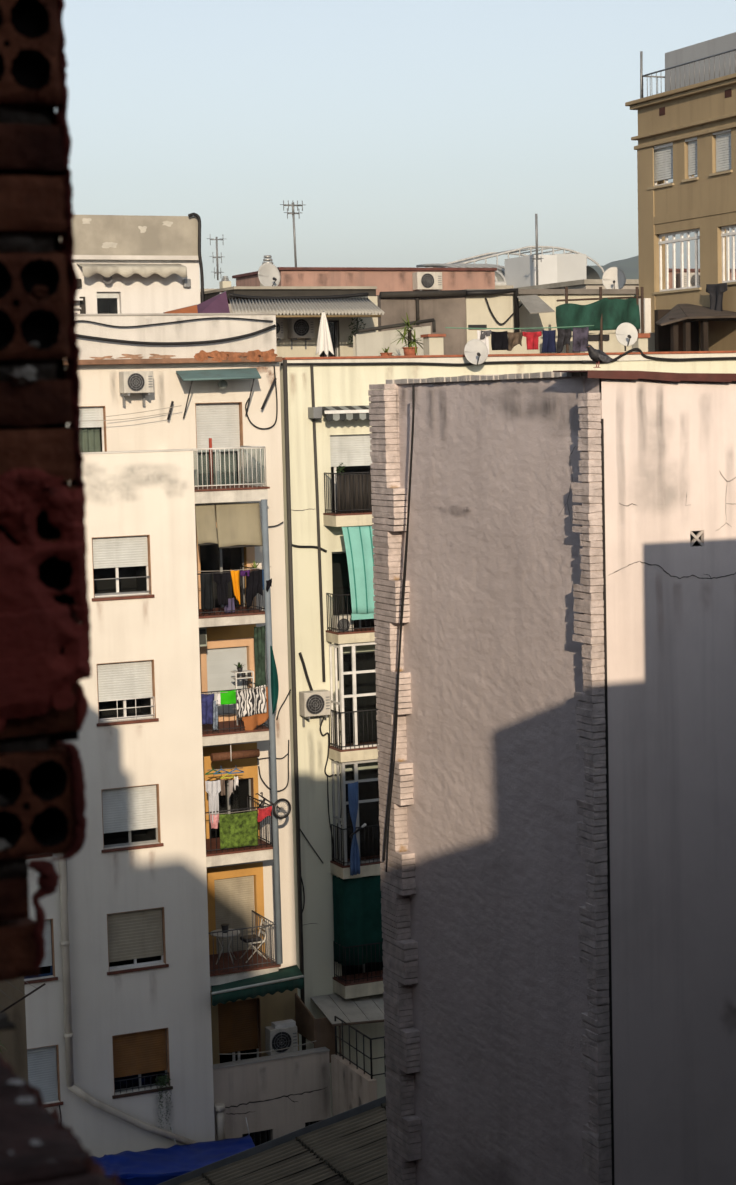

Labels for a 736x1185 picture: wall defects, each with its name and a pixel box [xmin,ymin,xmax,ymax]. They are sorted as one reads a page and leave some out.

peeling [0,0,175,732]
crack [608,561,736,579]
peeling [28,741,87,969]